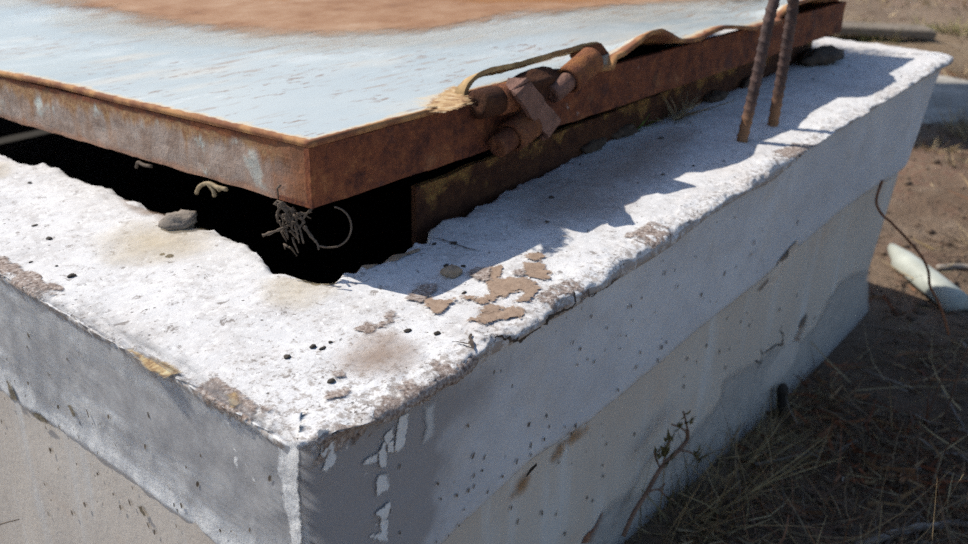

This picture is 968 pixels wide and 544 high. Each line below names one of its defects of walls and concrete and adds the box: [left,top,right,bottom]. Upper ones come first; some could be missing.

rust [47,0,695,37]
rust [425,86,470,113]
peeling [405,252,589,325]
peeling [0,256,478,544]